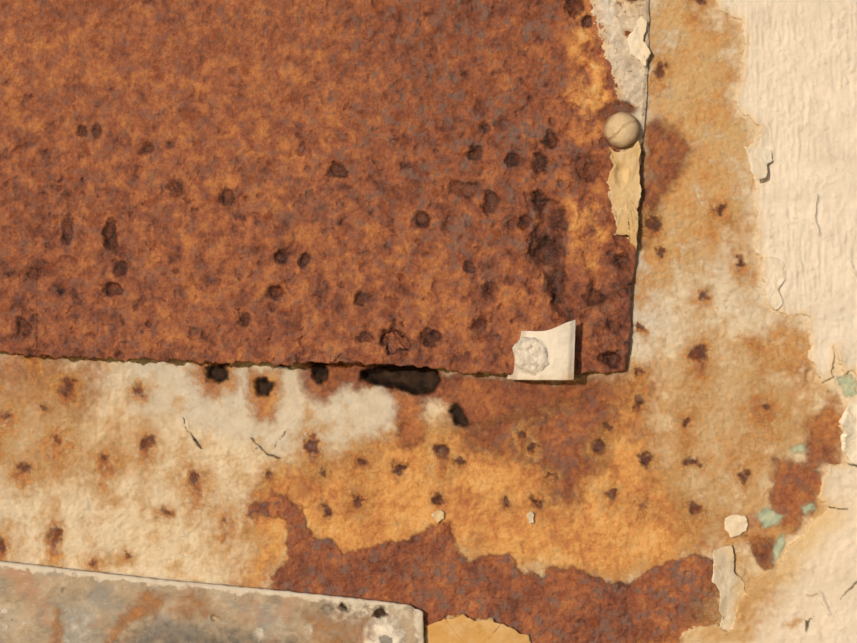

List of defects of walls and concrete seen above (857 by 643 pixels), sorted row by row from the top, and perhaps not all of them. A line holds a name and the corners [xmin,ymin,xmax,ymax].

spalling [565,0,592,27]
peeling [627,16,651,67]
rust [598,101,635,121]
rust [638,0,747,293]
peeling [744,146,773,180]
rust [684,337,714,391]
rust [0,353,96,489]
peeling [839,403,857,465]
rust [157,361,722,643]
rust [737,393,842,571]
rust [45,520,63,566]
peeling [712,515,748,631]